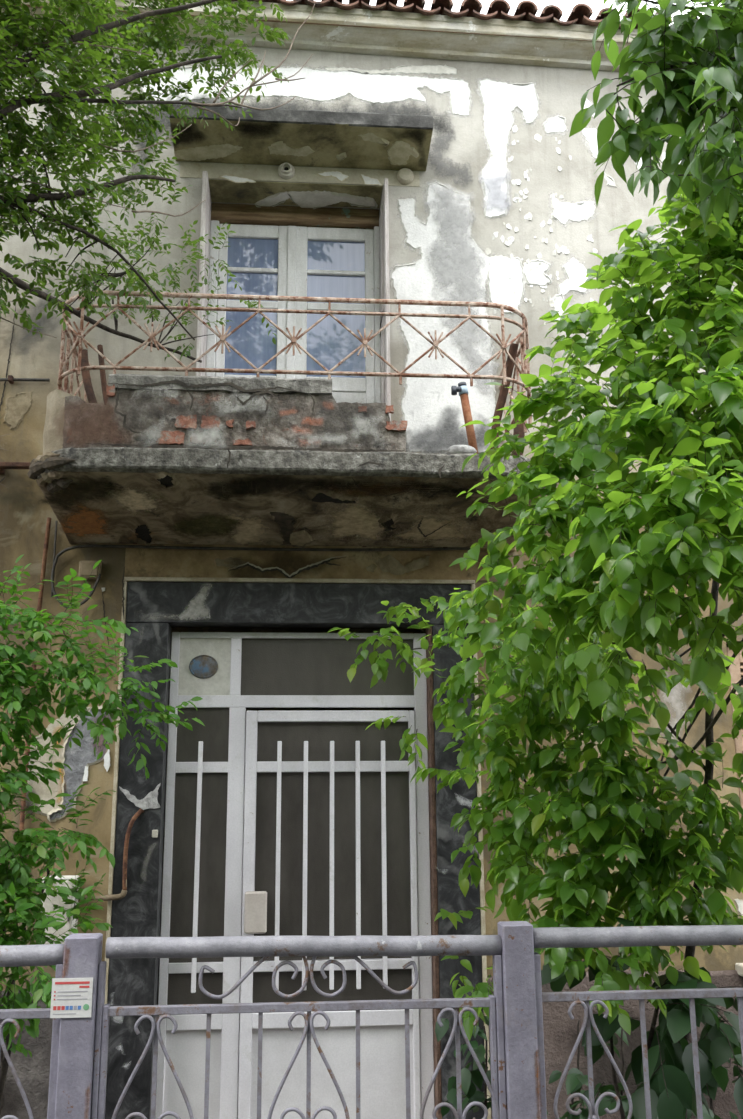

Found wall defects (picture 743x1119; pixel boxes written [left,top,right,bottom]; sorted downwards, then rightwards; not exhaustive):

leakage [134,95,509,390]
peeling [132,64,598,454]
leakage [406,409,489,454]
leakage [5,480,156,512]
leakage [208,477,468,544]
crack [229,555,346,578]
flaking render [26,705,114,822]